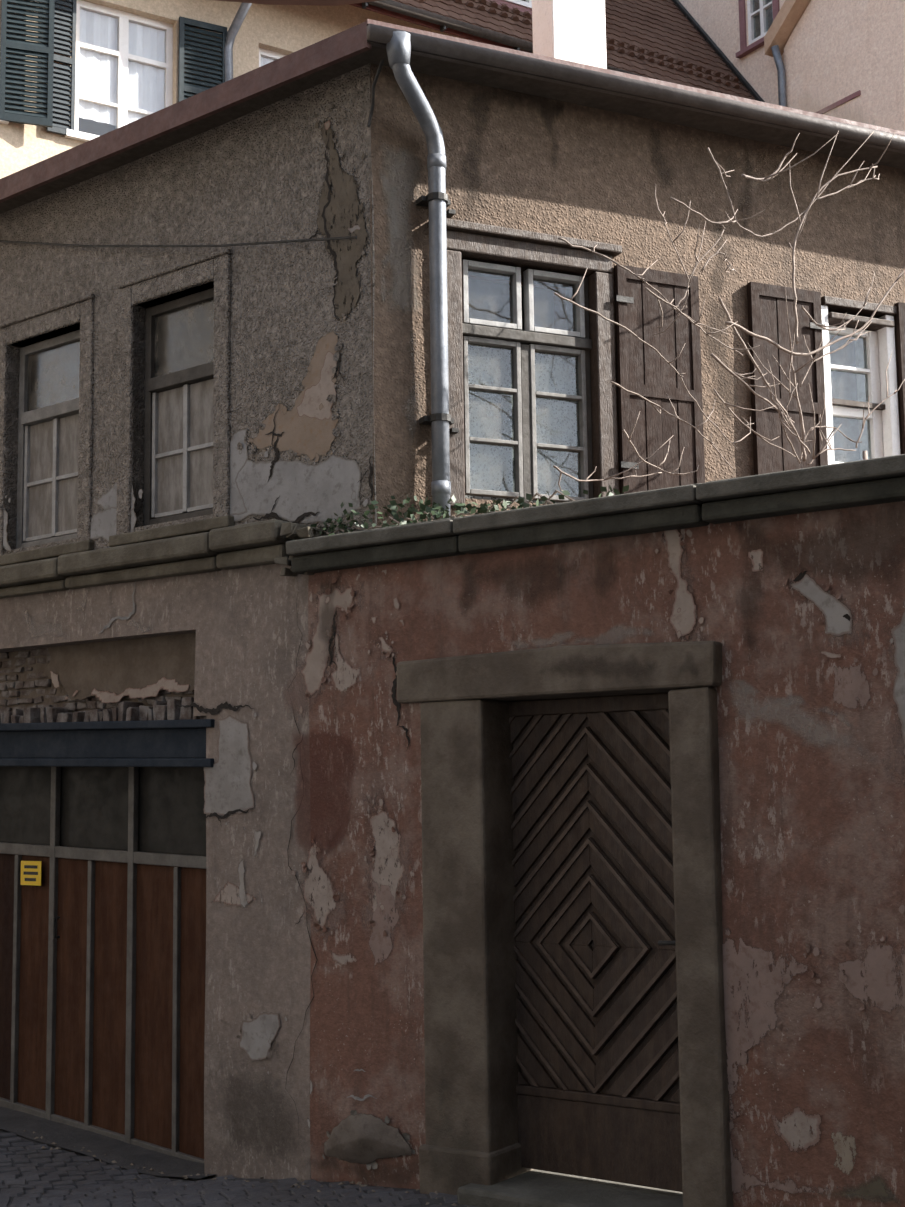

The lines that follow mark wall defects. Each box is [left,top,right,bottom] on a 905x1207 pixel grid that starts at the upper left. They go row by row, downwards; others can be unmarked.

crack [305,134,340,320]
flaking render [315,104,375,319]
flaking render [230,331,342,524]
flaking render [0,648,194,712]
peeling [655,529,704,642]
peeling [748,549,764,573]
flaking render [783,569,878,712]
peeling [291,831,357,966]
peeling [357,796,414,965]
flaking render [236,1013,288,1075]
peeling [722,928,894,1202]
peeling [838,934,905,1013]